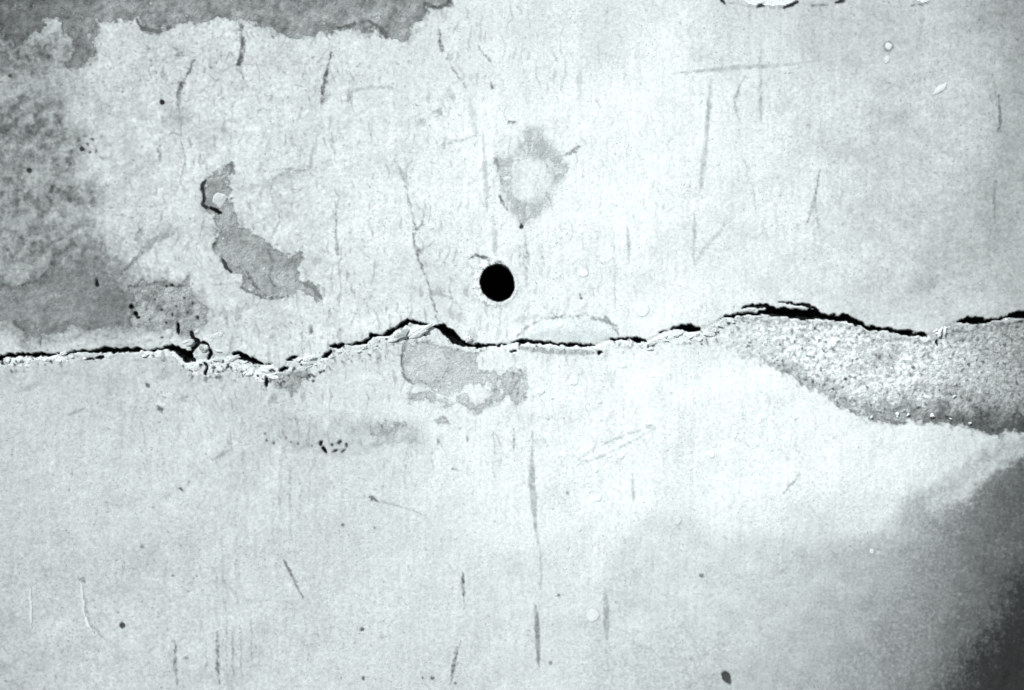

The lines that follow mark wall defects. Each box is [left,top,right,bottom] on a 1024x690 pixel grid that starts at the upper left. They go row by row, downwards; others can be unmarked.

damp [0,33,84,74]
peeling [0,0,453,68]
damp [0,92,104,291]
peeling [200,162,322,303]
crack [0,221,1024,386]
spalling [742,318,1024,435]
damp [878,459,1024,690]